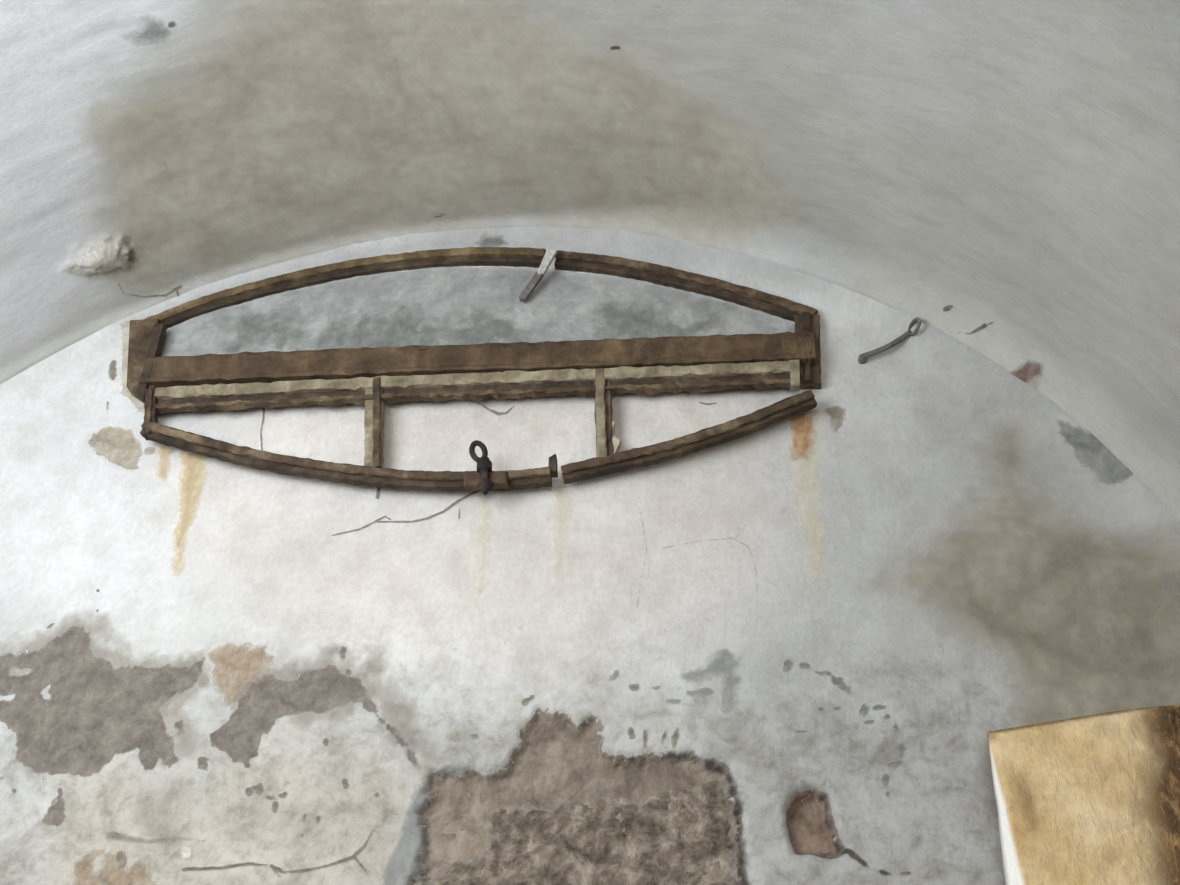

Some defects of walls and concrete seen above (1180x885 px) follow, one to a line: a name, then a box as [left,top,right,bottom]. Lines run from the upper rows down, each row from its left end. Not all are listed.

water stain [103,0,790,285]
flaking render [108,360,117,380]
flaking render [89,426,155,469]
corrosion [159,444,205,573]
crack [331,488,479,536]
corrosion [790,412,820,570]
water stain [906,429,1180,727]
flaking render [0,609,749,885]
crack [107,830,182,843]
crack [181,833,372,876]